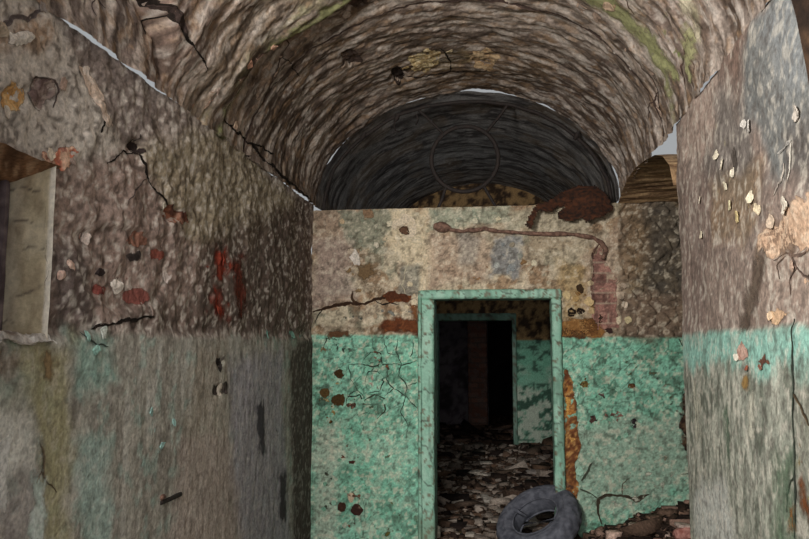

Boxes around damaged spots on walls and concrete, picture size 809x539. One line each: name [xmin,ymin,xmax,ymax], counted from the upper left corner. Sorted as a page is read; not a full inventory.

flaking render [0,1,47,46]
crack [136,0,208,72]
water stain [264,0,351,55]
water stain [586,0,701,97]
flaking render [1,76,68,119]
crack [224,0,665,202]
crack [107,134,168,205]
peeling [745,190,809,272]
corrosion [206,246,247,319]
crack [313,291,411,323]
flaking render [679,390,687,458]
crack [786,319,809,539]